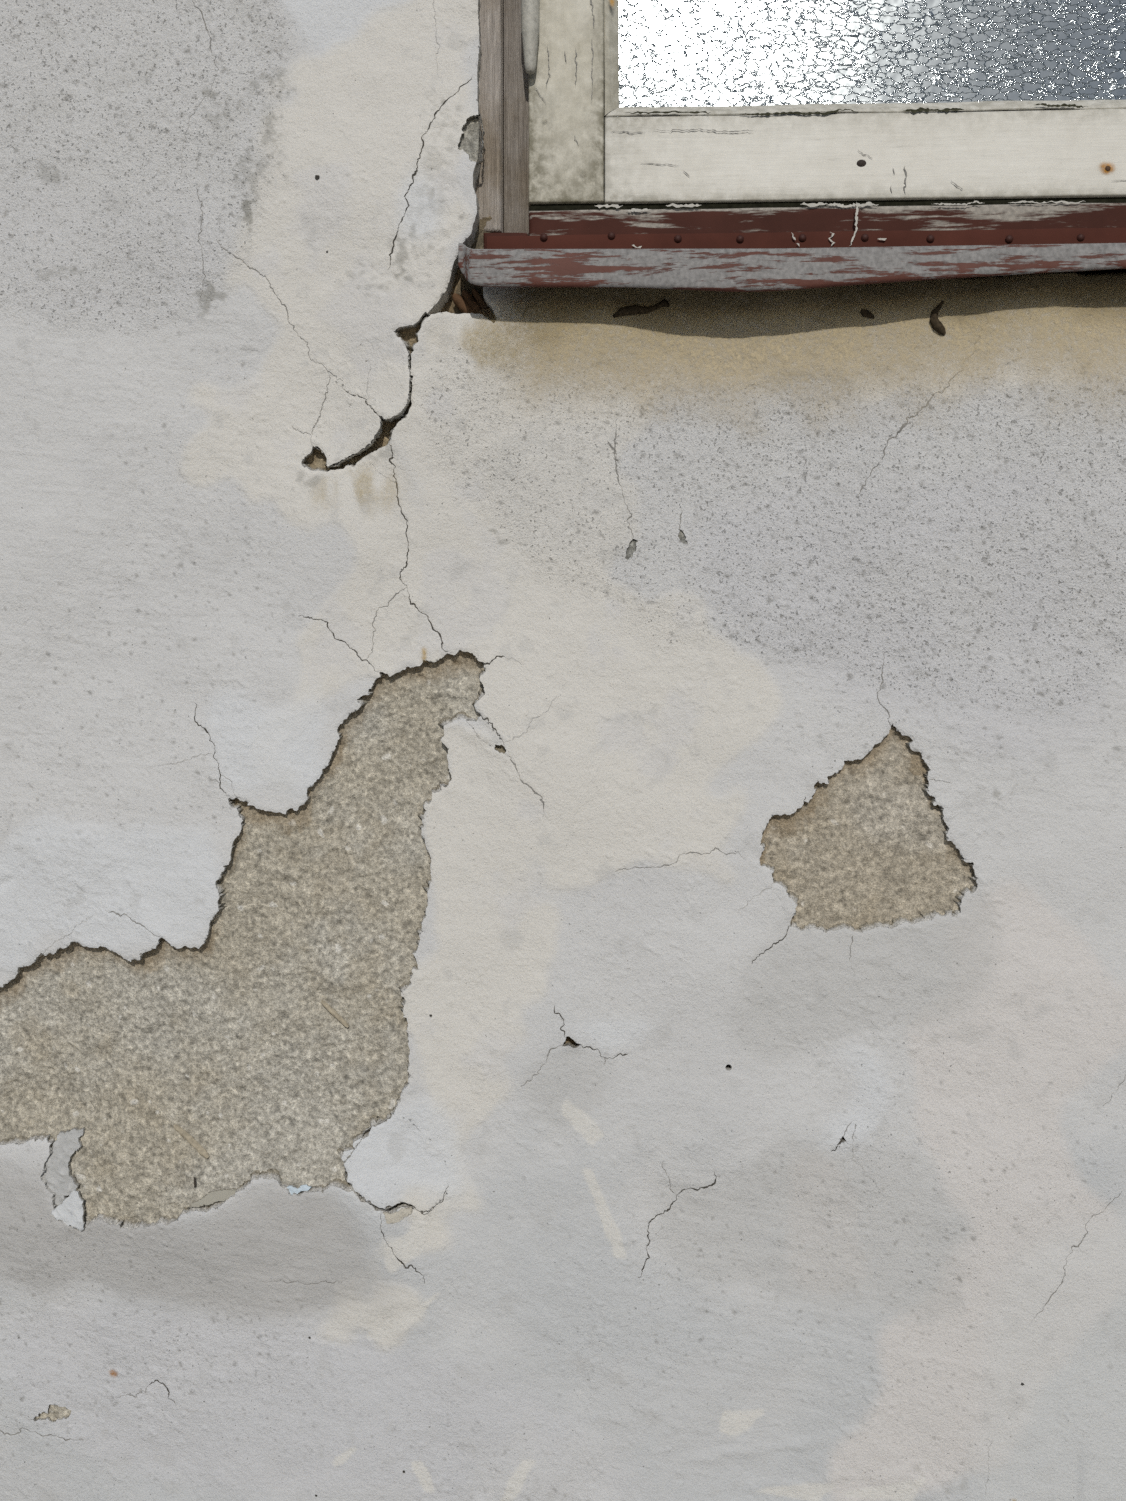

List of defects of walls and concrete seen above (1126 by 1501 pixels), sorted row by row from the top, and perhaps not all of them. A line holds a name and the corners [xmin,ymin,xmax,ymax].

crack [181,2,445,672]
crack [169,702,241,799]
crack [480,698,555,815]
spalling [760,724,978,933]
spalling [0,650,506,1232]
crack [522,1006,627,1086]